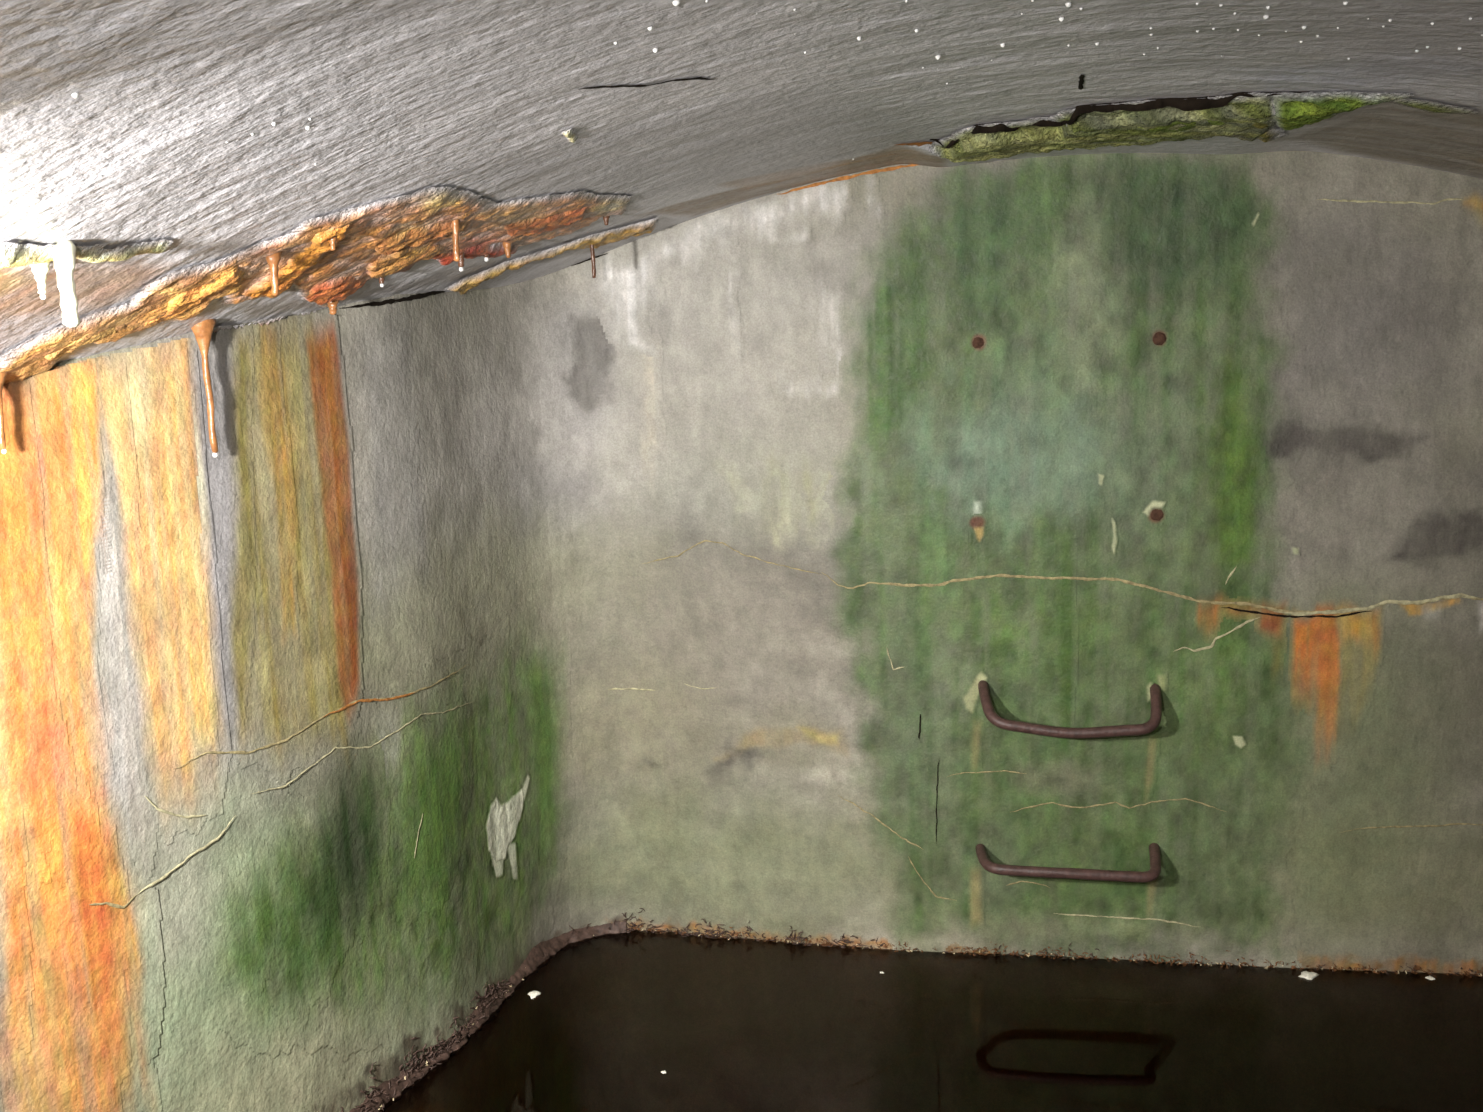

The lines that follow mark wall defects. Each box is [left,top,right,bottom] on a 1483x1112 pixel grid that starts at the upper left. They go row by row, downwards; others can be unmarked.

crack [578,77,714,90]
crack [781,74,1310,195]
damp [0,173,885,502]
damp [97,468,166,1066]
rust [0,310,364,1112]
crack [89,664,474,909]
damp [214,693,473,1040]
damp [520,624,572,880]
crack [642,540,1483,652]
rust [1194,589,1464,777]
damp [1297,949,1483,985]
damp [1373,504,1483,576]